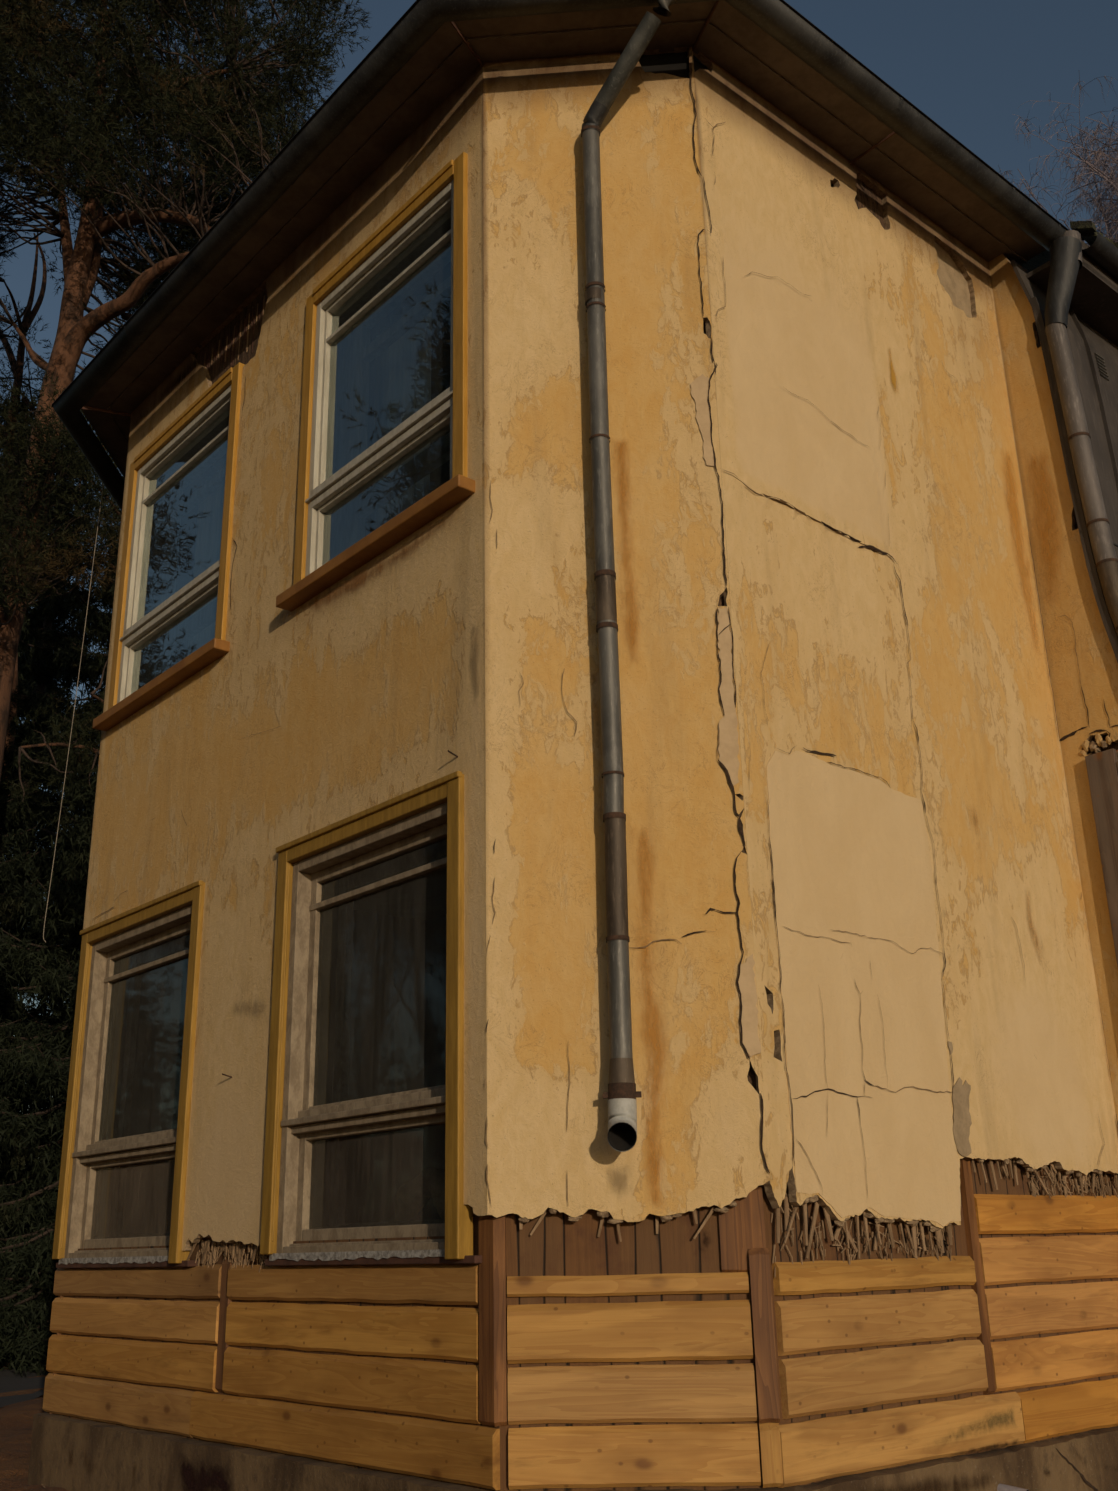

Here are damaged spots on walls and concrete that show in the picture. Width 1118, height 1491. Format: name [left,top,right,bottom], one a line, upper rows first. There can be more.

crack [629,66,954,1194]
spalling [855,178,886,230]